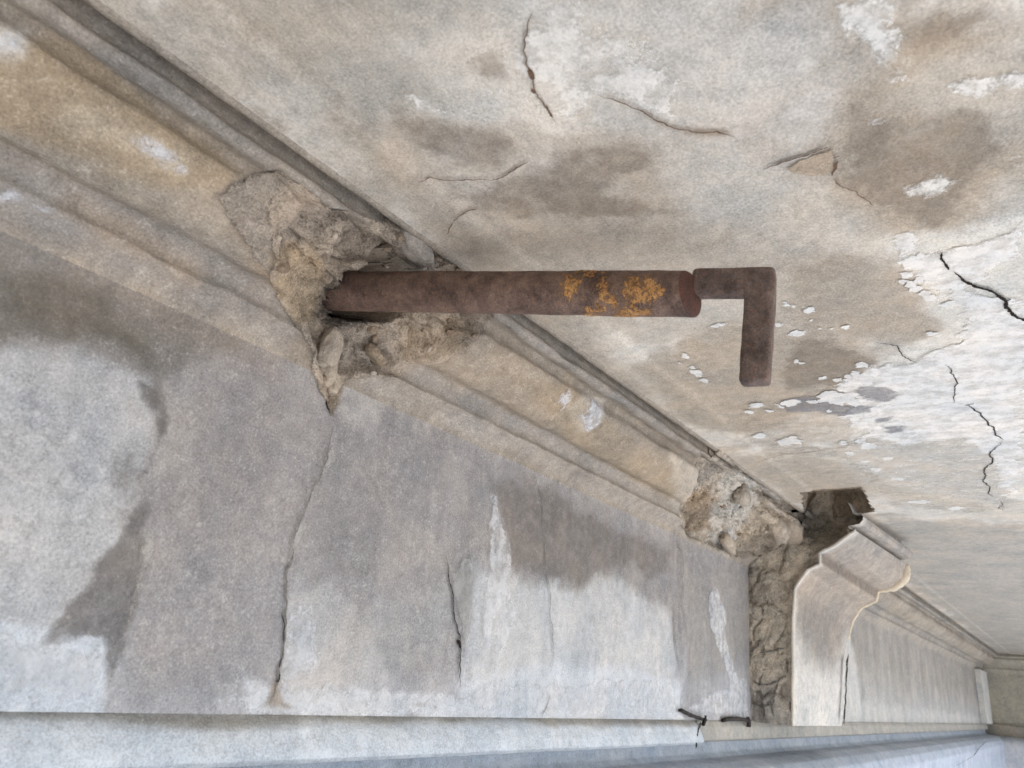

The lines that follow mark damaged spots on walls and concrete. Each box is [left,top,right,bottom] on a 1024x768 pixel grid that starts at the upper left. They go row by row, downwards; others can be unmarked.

crack [521,14,557,124]
damp [947,70,1024,98]
damp [906,178,953,196]
spalling [213,171,494,415]
corrosion [560,270,665,318]
peeling [775,302,850,337]
crack [940,253,1024,321]
peeling [744,362,907,433]
crack [948,366,1003,510]
spalling [679,448,807,558]
damp [0,509,153,700]
crack [842,654,850,722]